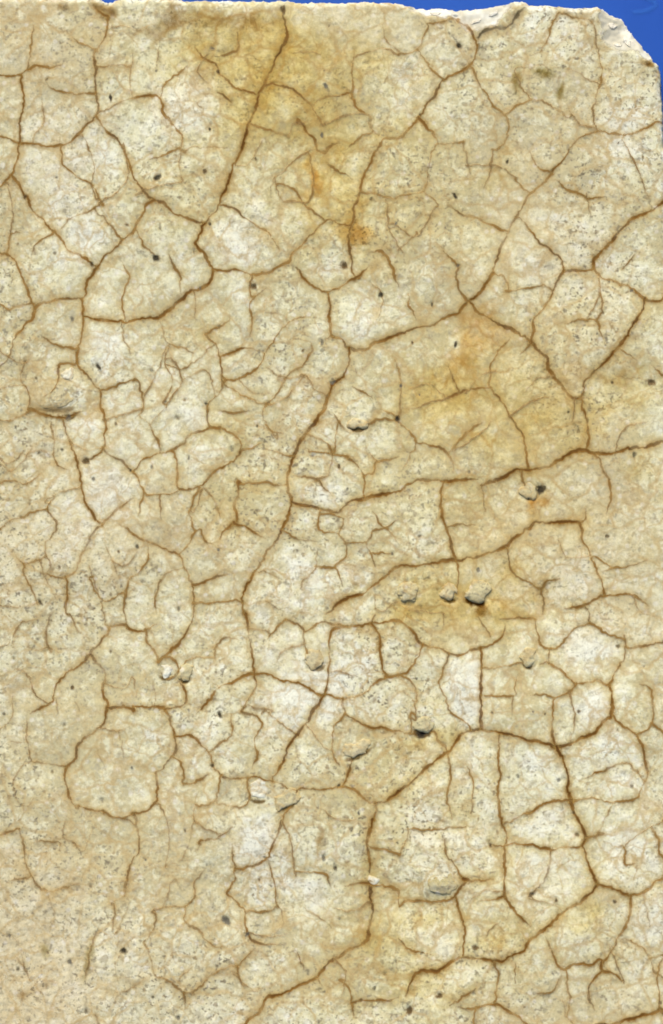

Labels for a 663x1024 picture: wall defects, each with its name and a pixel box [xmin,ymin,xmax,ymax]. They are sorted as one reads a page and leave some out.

crack [24,407,80,419]
crack [276,805,292,836]
crack [365,818,374,870]
crack [369,846,401,856]
crack [348,879,380,887]
crack [360,885,374,915]
crack [381,884,400,898]
crack [398,877,487,907]
crack [244,927,371,1024]
crack [551,951,625,1003]
crack [612,963,663,1024]
crack [460,1003,528,1024]